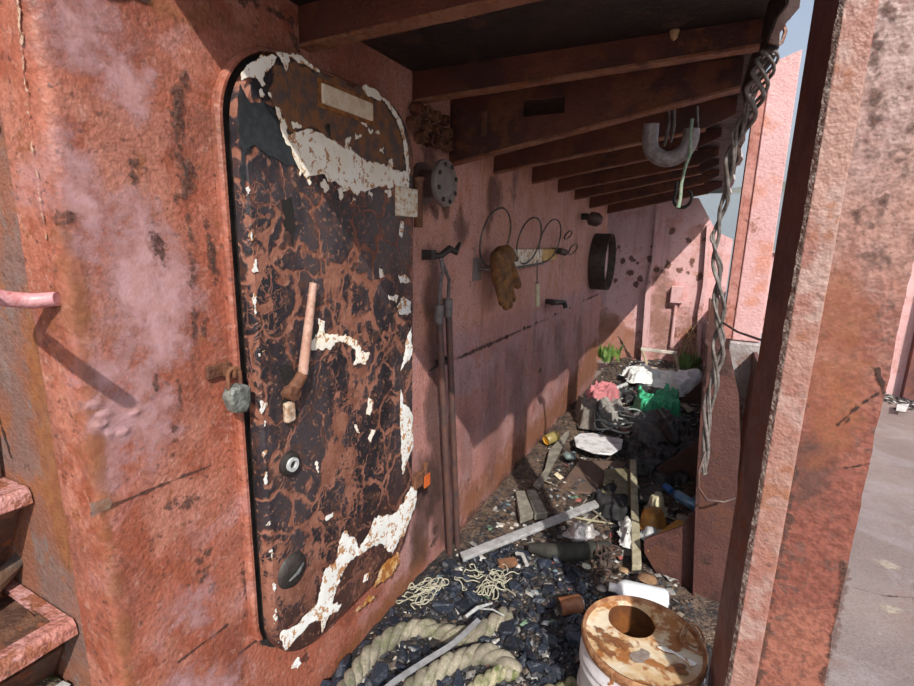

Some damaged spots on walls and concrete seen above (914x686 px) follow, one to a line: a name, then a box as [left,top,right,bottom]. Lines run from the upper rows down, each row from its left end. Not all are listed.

rust [238,0,405,171]
peeling [241,52,411,204]
rust [30,327,68,566]
peeling [388,294,411,315]
peeling [401,326,413,370]
peeling [400,391,414,474]
crack [836,367,886,426]
rust [0,552,23,593]
peeling [273,486,417,650]
rust [338,533,427,663]